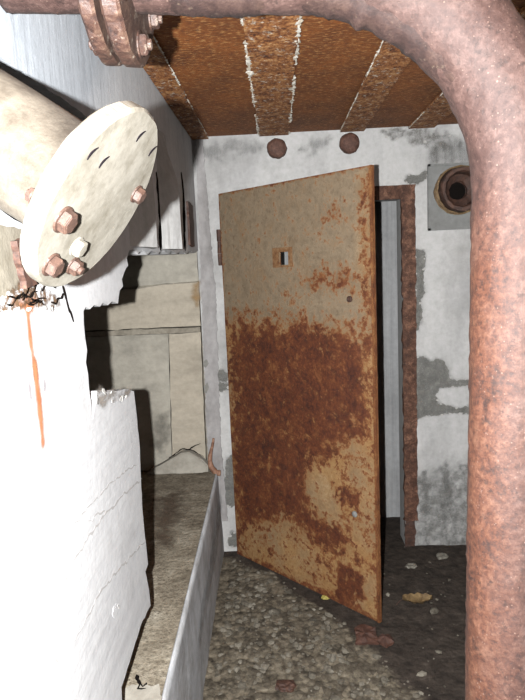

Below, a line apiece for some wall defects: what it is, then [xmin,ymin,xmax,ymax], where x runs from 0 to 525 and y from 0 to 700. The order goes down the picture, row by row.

leakage [293,15,304,65]
leakage [243,41,260,136]
leakage [288,75,296,134]
spalling [0,225,64,316]
crack [62,286,74,322]
corrosion [13,297,44,447]
spalling [96,388,131,407]
leakage [416,465,468,546]